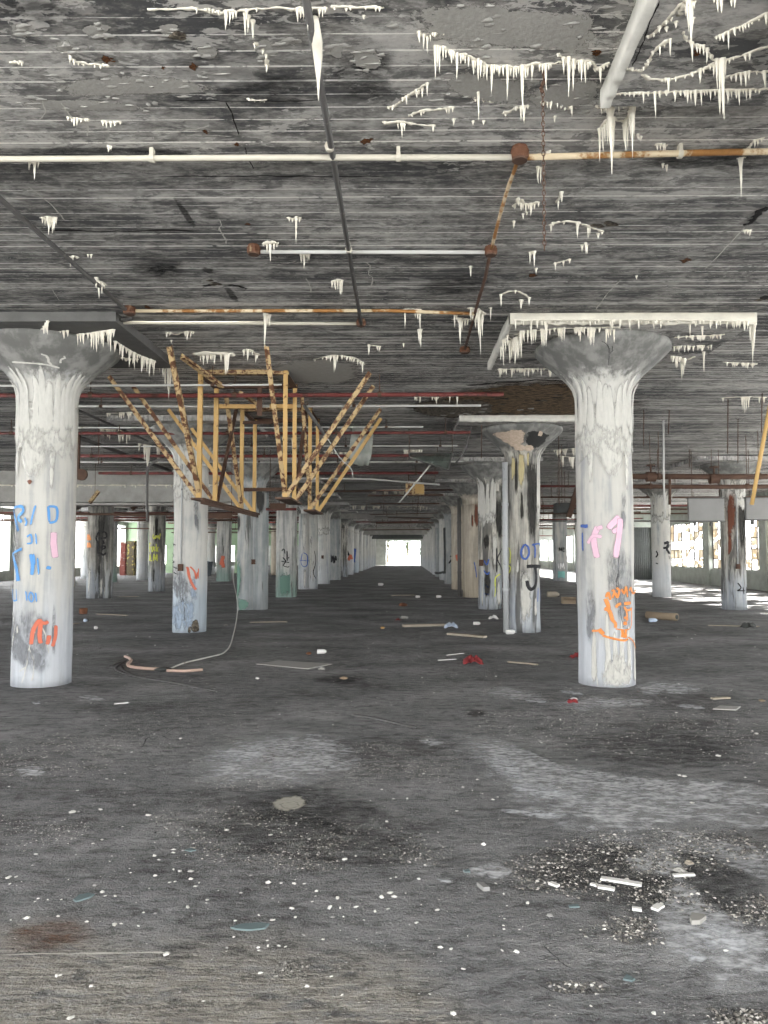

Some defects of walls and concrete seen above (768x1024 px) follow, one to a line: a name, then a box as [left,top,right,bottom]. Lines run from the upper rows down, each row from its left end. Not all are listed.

peeling [11,23,37,37]
peeling [82,22,115,40]
peeling [151,24,217,59]
peeling [410,2,616,116]
peeling [15,72,231,113]
water stain [338,0,768,170]
spalling [410,397,509,419]
water stain [414,290,758,536]
peeling [493,430,543,451]
rust [727,495,735,555]
water stain [200,734,403,861]